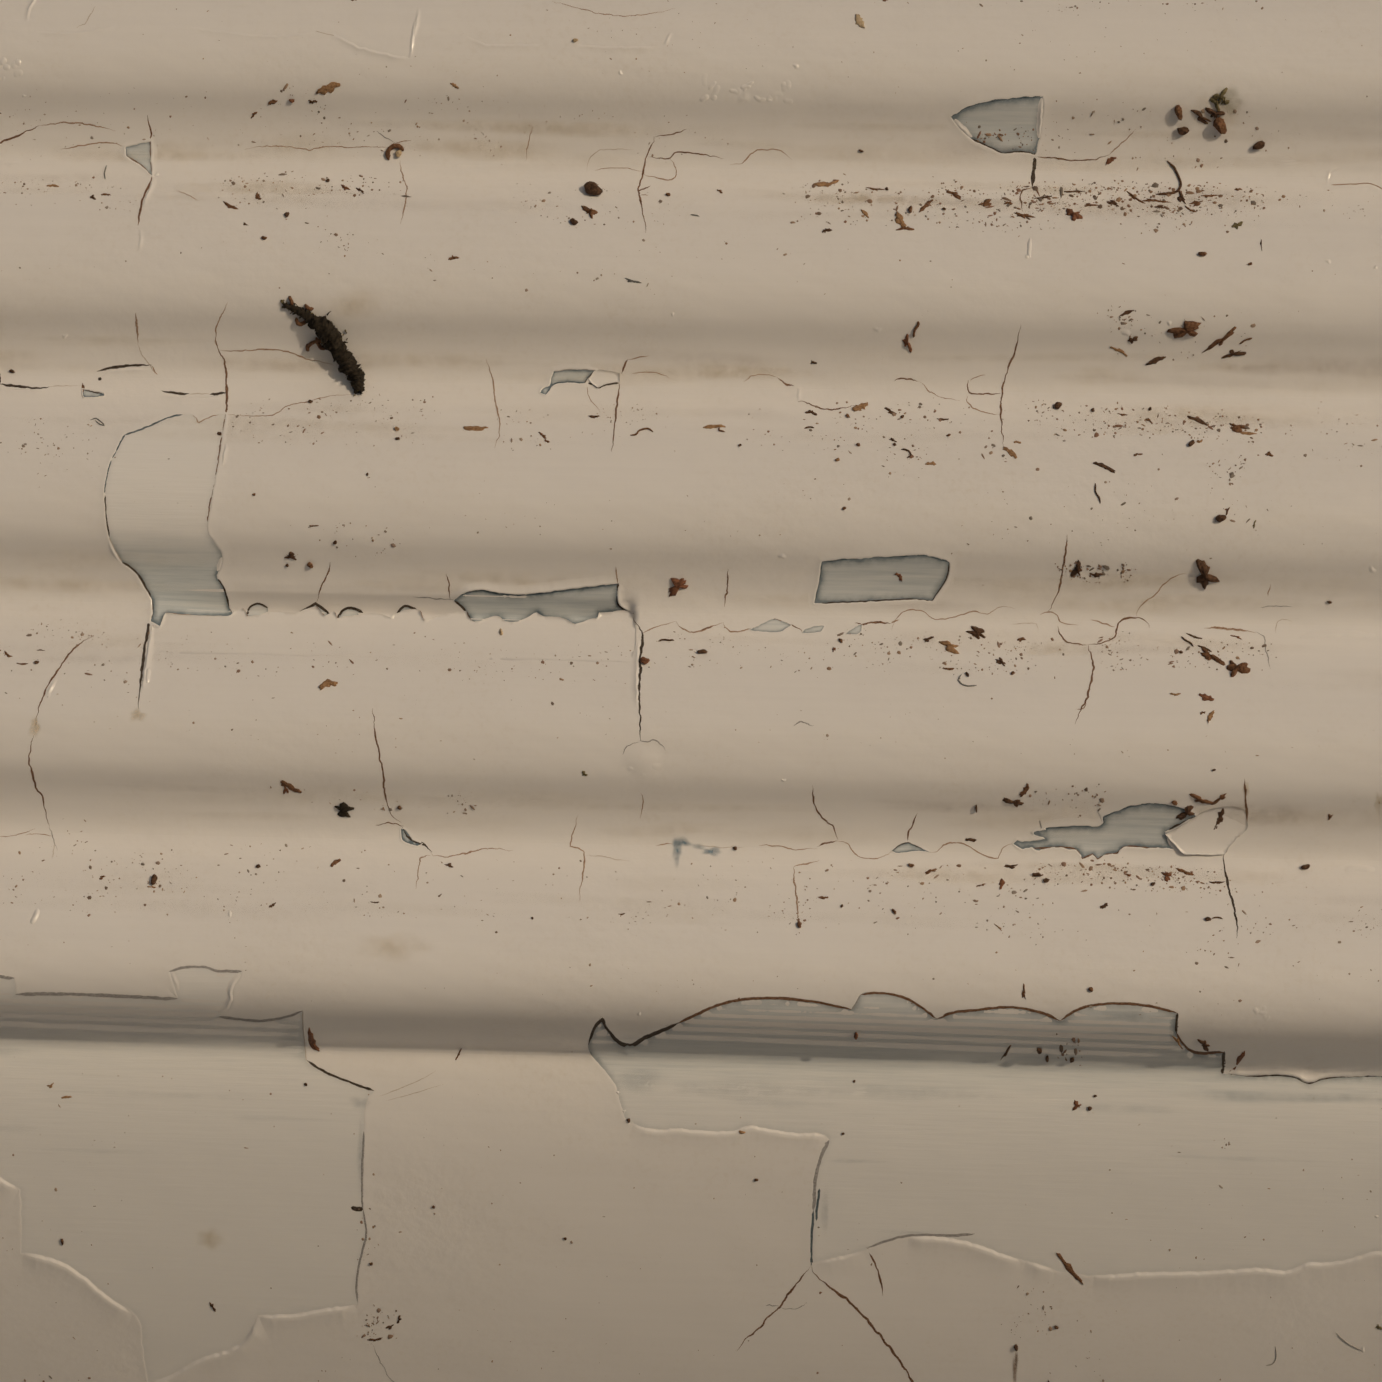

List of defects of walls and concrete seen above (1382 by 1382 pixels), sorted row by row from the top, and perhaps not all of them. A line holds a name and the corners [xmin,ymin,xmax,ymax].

peeling [943,85,1136,212]
peeling [0,364,157,399]
peeling [94,391,1039,707]
peeling [890,790,1248,869]
peeling [0,951,384,1382]
peeling [573,977,1382,1309]
crack [739,1247,914,1382]